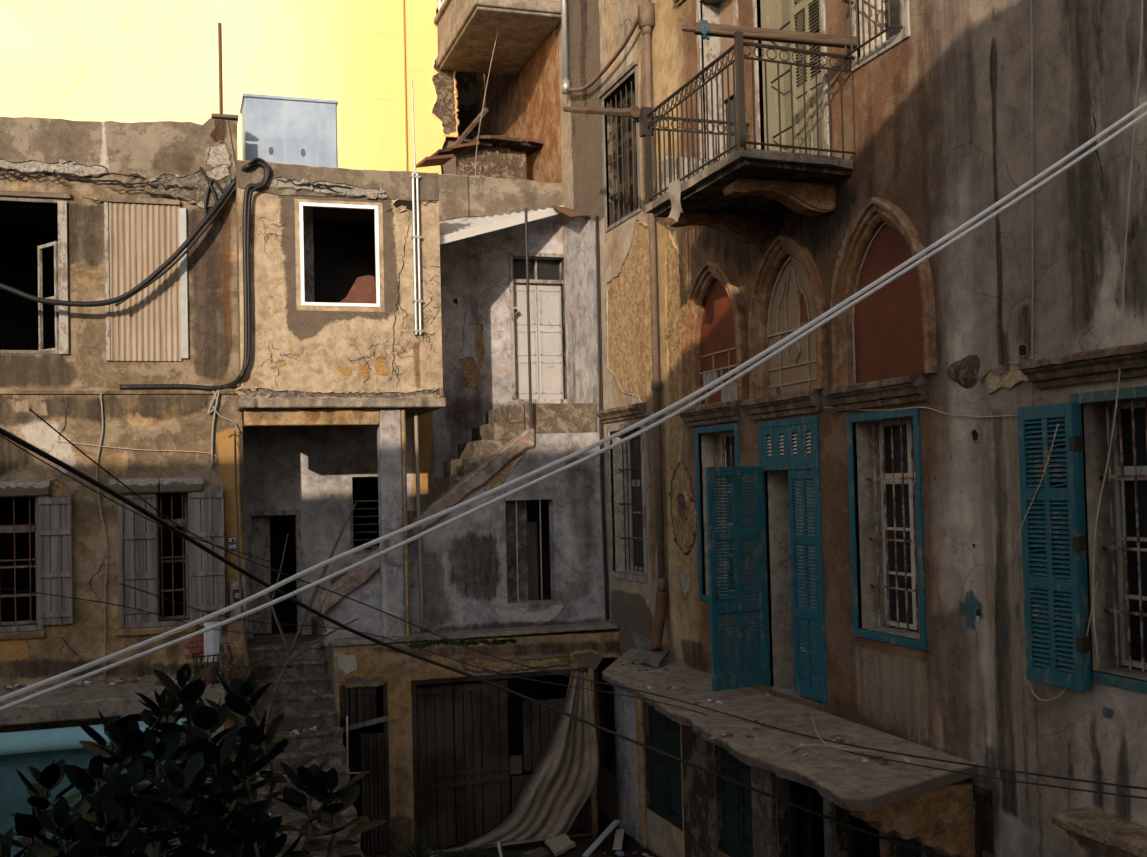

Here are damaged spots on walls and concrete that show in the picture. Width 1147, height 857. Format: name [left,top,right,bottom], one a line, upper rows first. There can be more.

peeling [430,57,459,138]
peeling [0,158,109,177]
peeling [144,140,233,209]
peeling [260,175,416,214]
damp [989,41,1009,372]
damp [1064,0,1107,322]
crack [346,201,445,389]
damp [1116,220,1147,313]
peeling [606,218,698,602]
peeling [411,412,434,511]
damp [973,399,1027,857]
damp [1117,739,1130,819]